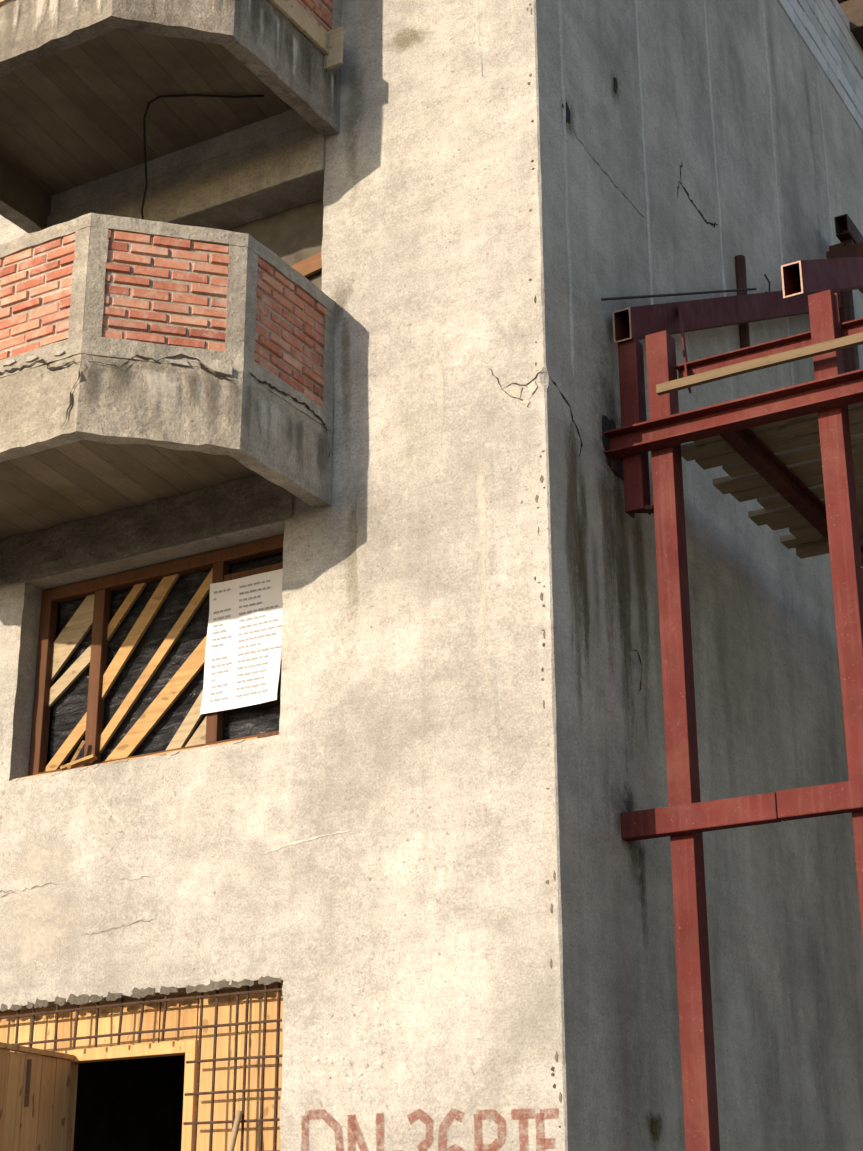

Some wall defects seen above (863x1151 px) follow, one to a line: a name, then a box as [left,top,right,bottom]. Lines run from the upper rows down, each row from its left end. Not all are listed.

leakage [35,0,57,21]
crack [573,130,645,217]
crack [677,165,718,227]
leakage [147,373,213,414]
spalling [163,359,233,378]
crack [490,369,583,456]
leakage [567,436,589,649]
leakage [602,479,648,689]